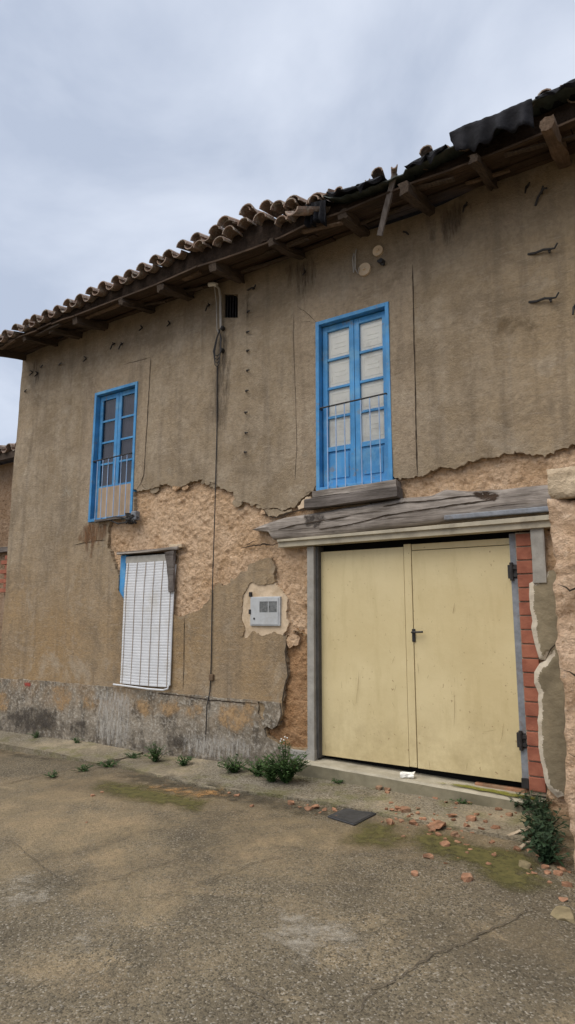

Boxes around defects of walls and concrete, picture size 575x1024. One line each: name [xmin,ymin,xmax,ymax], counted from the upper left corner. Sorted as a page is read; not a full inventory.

flaking render [397,446,575,498]
leakage [0,686,71,731]
flaking render [110,480,349,748]
flaking render [529,529,570,820]